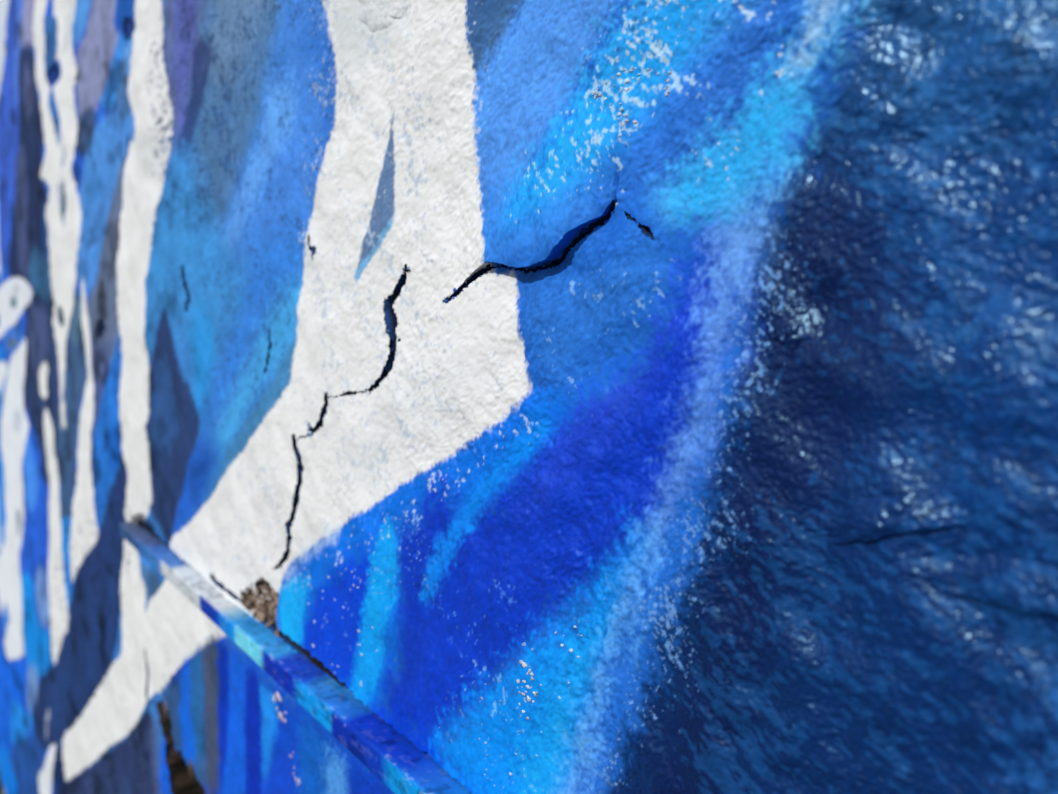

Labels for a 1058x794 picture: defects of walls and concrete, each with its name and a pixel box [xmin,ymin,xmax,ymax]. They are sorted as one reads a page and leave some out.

crack [442,198,655,303]
crack [275,264,411,569]
spalling [240,577,279,637]
spalling [152,699,205,794]